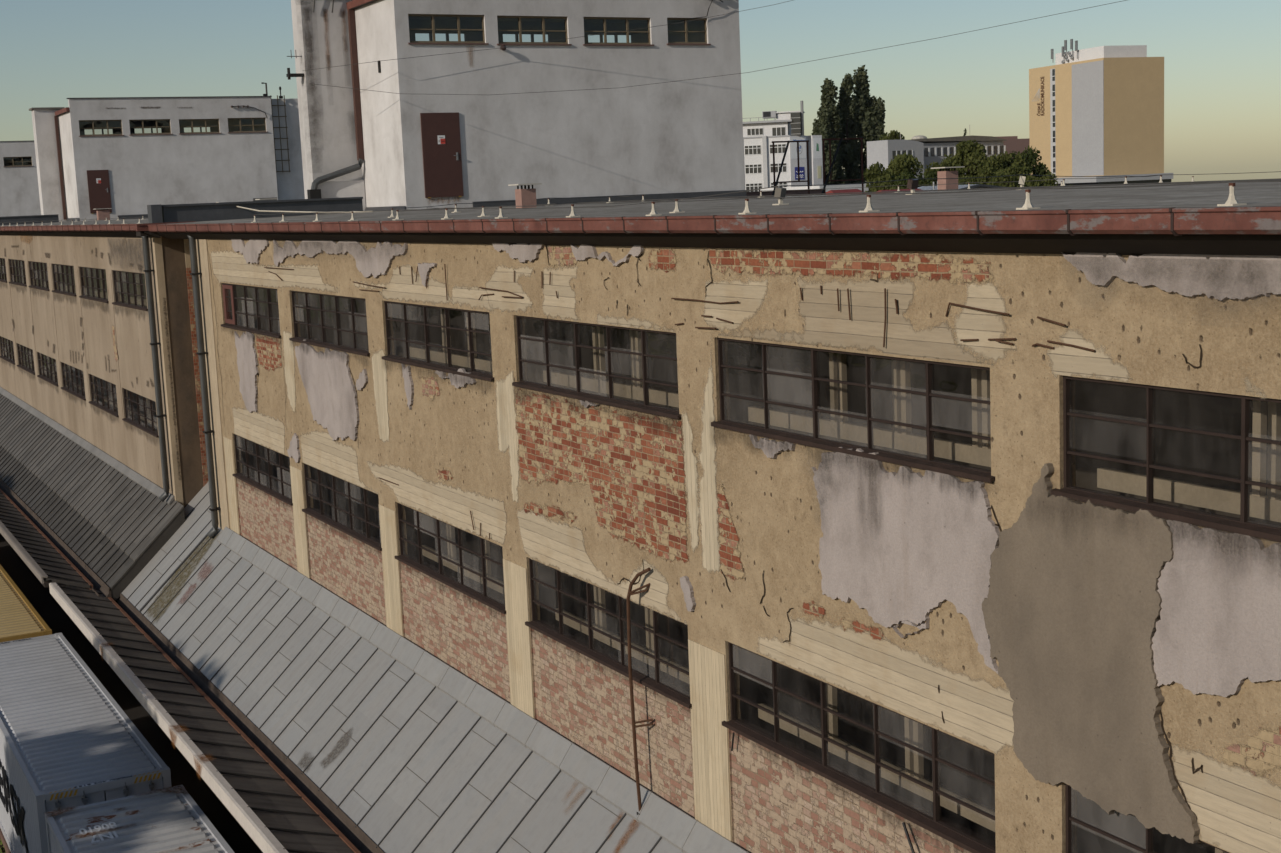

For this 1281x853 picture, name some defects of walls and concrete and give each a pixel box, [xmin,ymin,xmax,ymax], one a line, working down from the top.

spalling [211,239,676,321]
flaking render [1061,252,1281,301]
spalling [597,314,674,332]
spalling [1047,330,1129,382]
flaking render [233,331,745,624]
flaking render [757,447,1015,753]
flaking render [1152,519,1281,697]